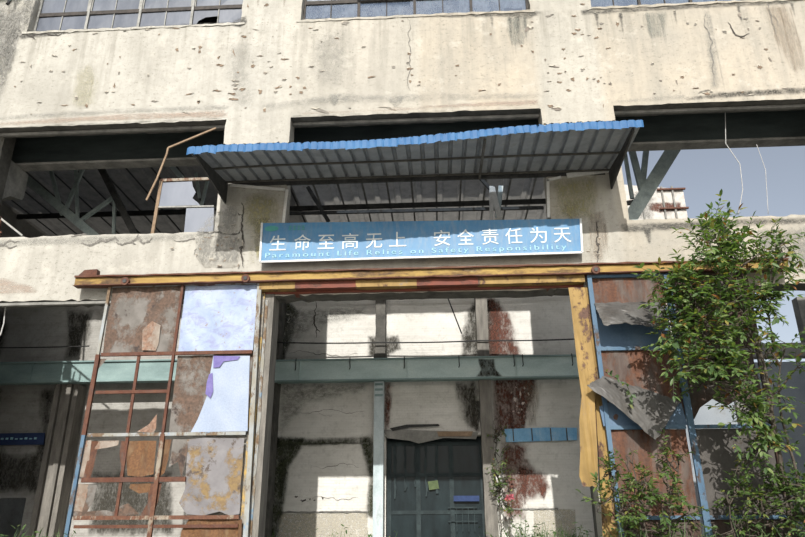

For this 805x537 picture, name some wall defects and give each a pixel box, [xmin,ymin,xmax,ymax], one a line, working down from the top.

leakage [0,14,64,77]
crack [704,16,715,76]
crack [174,203,245,266]
crack [289,303,355,358]
mould [386,336,400,355]
mould [462,304,477,356]
rust [478,300,535,431]
mould [456,382,480,431]
mould [271,438,373,537]
rust [503,444,547,521]